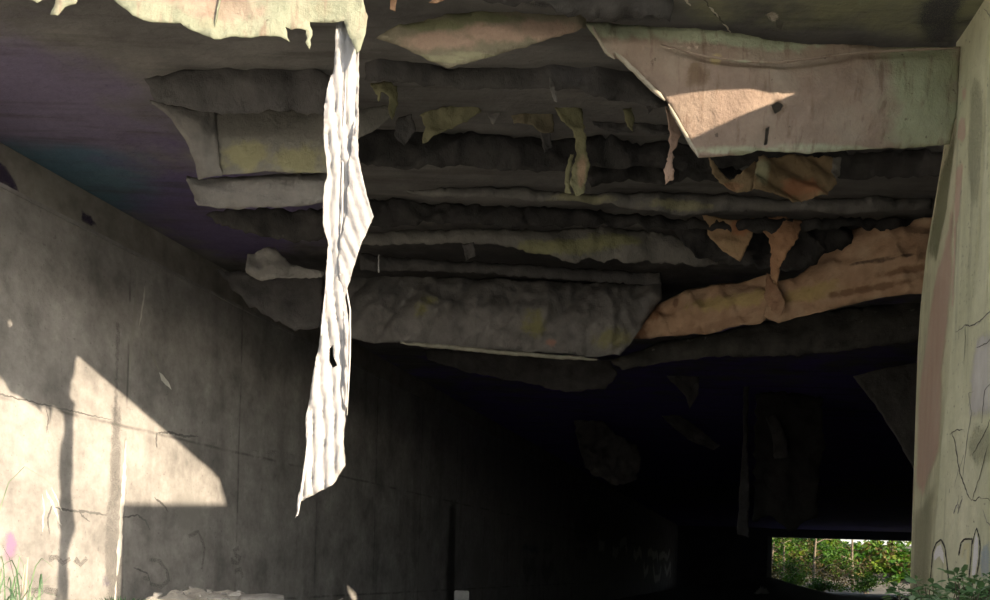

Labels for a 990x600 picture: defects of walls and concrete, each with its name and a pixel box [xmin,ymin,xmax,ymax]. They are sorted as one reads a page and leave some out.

crack [957,311,990,355]
crack [0,393,111,430]
crack [155,431,198,447]
crack [951,384,990,526]